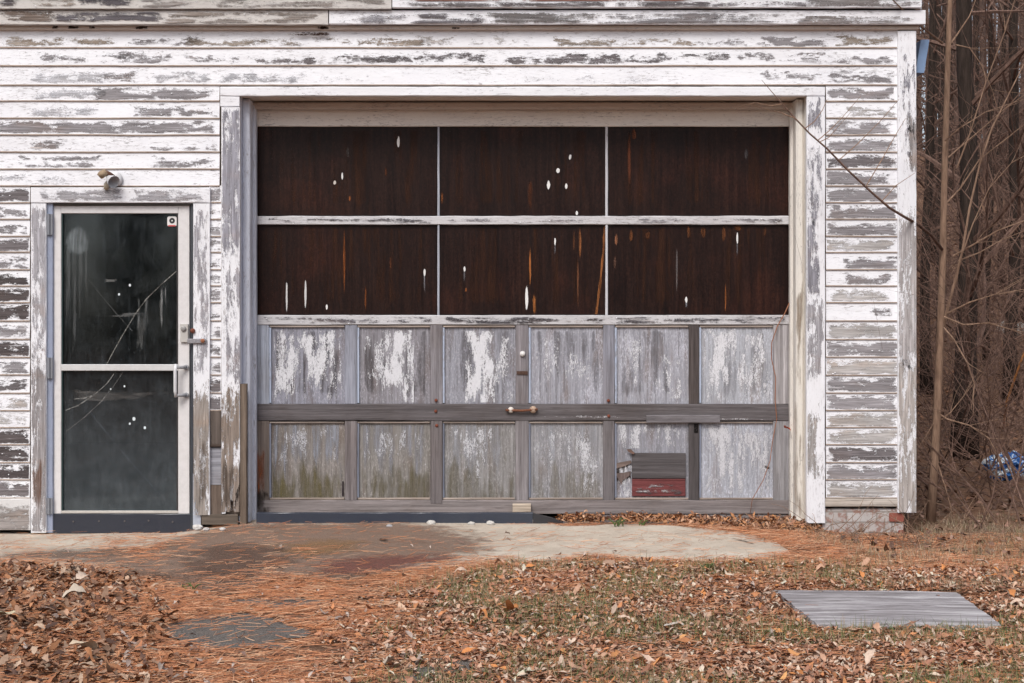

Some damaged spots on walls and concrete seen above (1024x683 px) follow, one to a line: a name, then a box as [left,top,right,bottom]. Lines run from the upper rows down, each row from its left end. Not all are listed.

peeling [0,0,916,531]